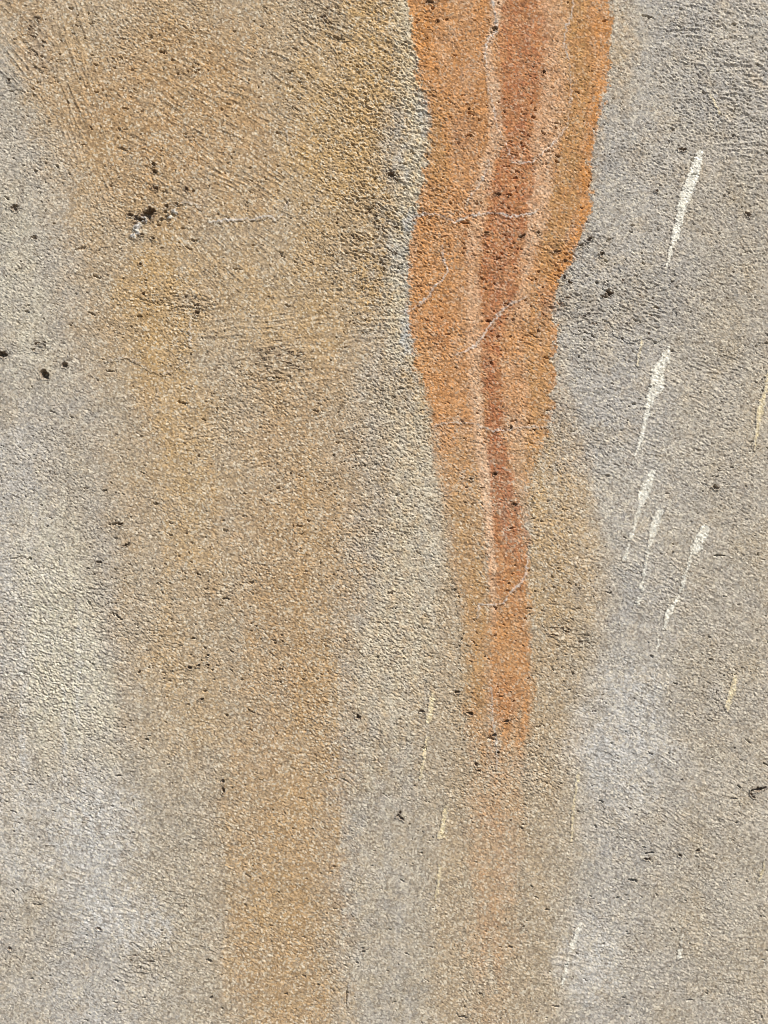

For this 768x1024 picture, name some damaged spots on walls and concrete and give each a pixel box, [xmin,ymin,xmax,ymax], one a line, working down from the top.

corrosion [402,0,643,1024]